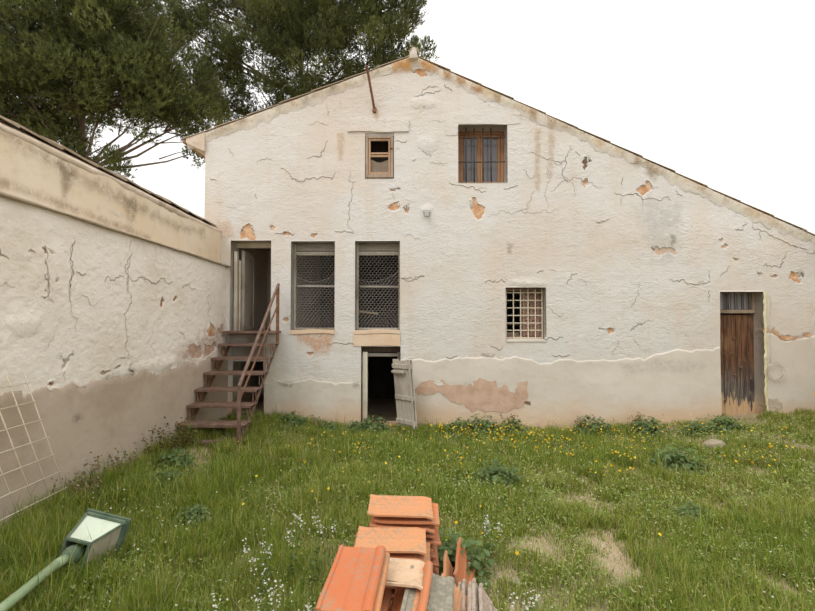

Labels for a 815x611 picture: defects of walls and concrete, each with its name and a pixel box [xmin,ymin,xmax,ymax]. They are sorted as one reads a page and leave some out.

crack [260,102,354,234]
peeling [388,186,410,214]
peeling [470,196,485,220]
crack [394,139,683,215]
peeling [636,179,654,196]
peeling [240,222,256,240]
peeling [650,245,676,257]
peeling [788,270,805,283]
crack [0,239,210,370]
peeling [187,320,224,358]
peeling [763,328,812,340]
peeling [415,378,531,413]